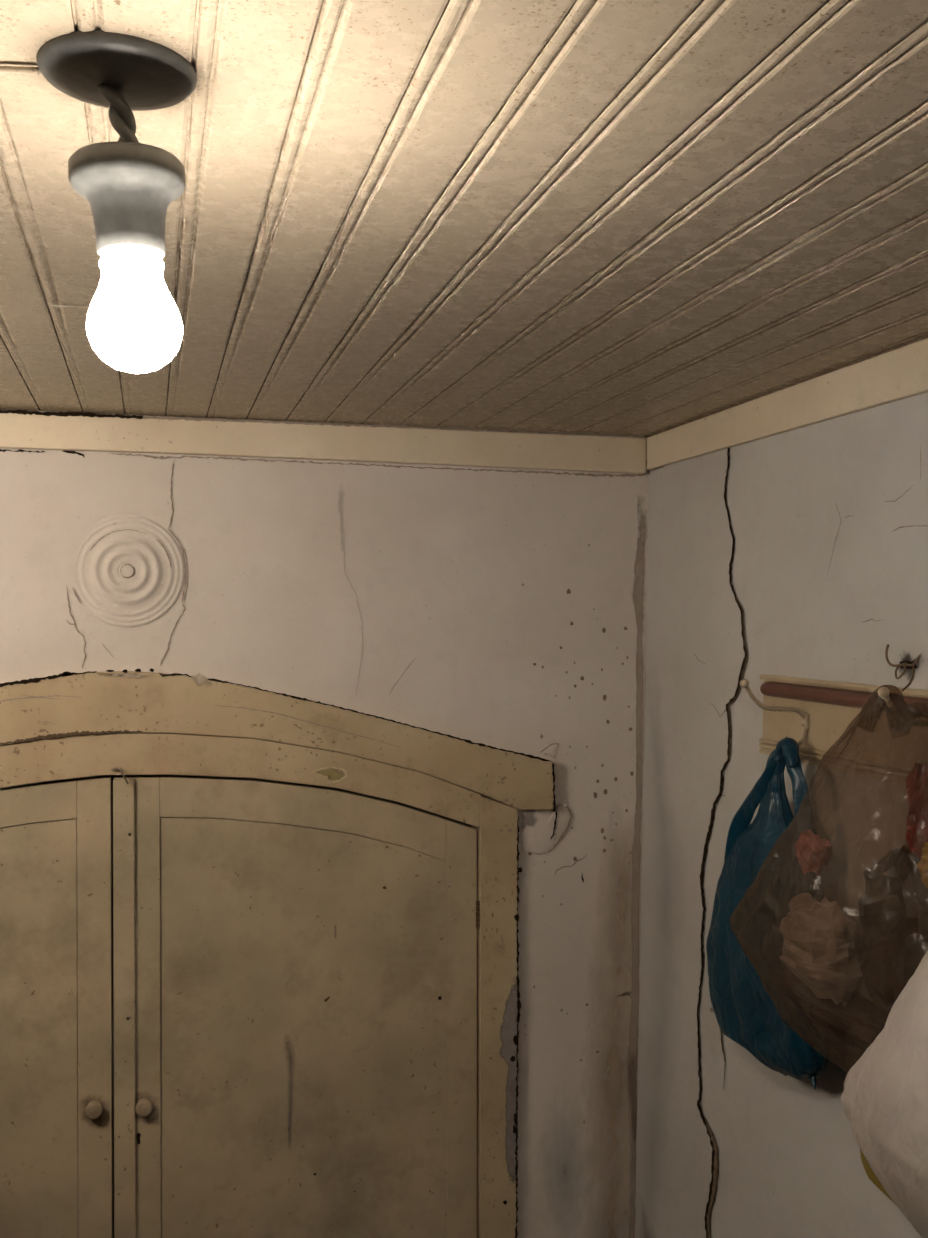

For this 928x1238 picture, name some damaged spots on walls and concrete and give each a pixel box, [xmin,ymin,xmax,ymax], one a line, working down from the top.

crack [0,449,664,812]
crack [503,817,522,1238]
crack [697,448,748,1238]